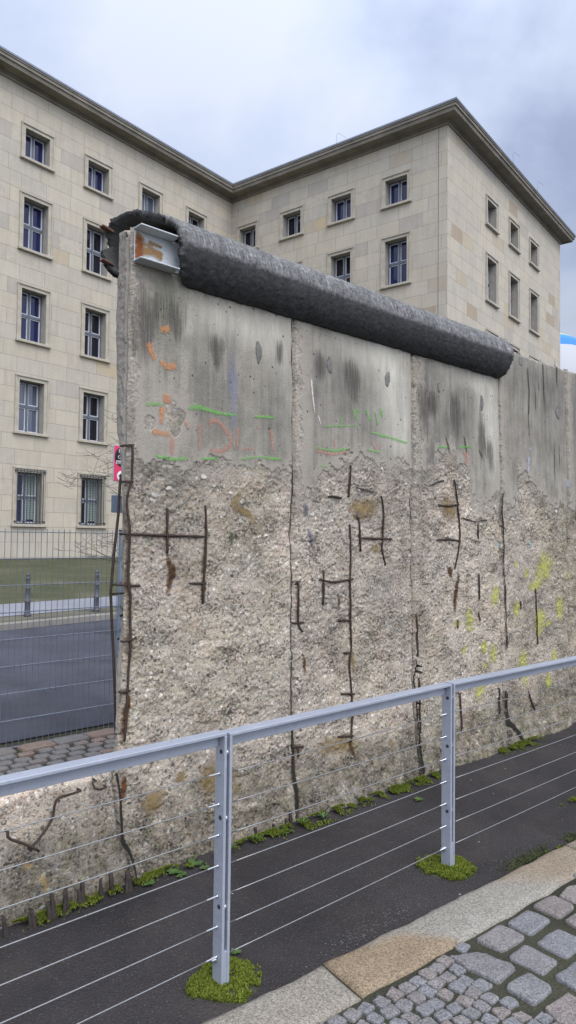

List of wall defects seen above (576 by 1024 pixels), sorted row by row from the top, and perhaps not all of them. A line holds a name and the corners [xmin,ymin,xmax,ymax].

rust [135,232,163,260]
rust [167,558,176,590]
spalling [109,227,576,845]
spalling [112,747,216,880]